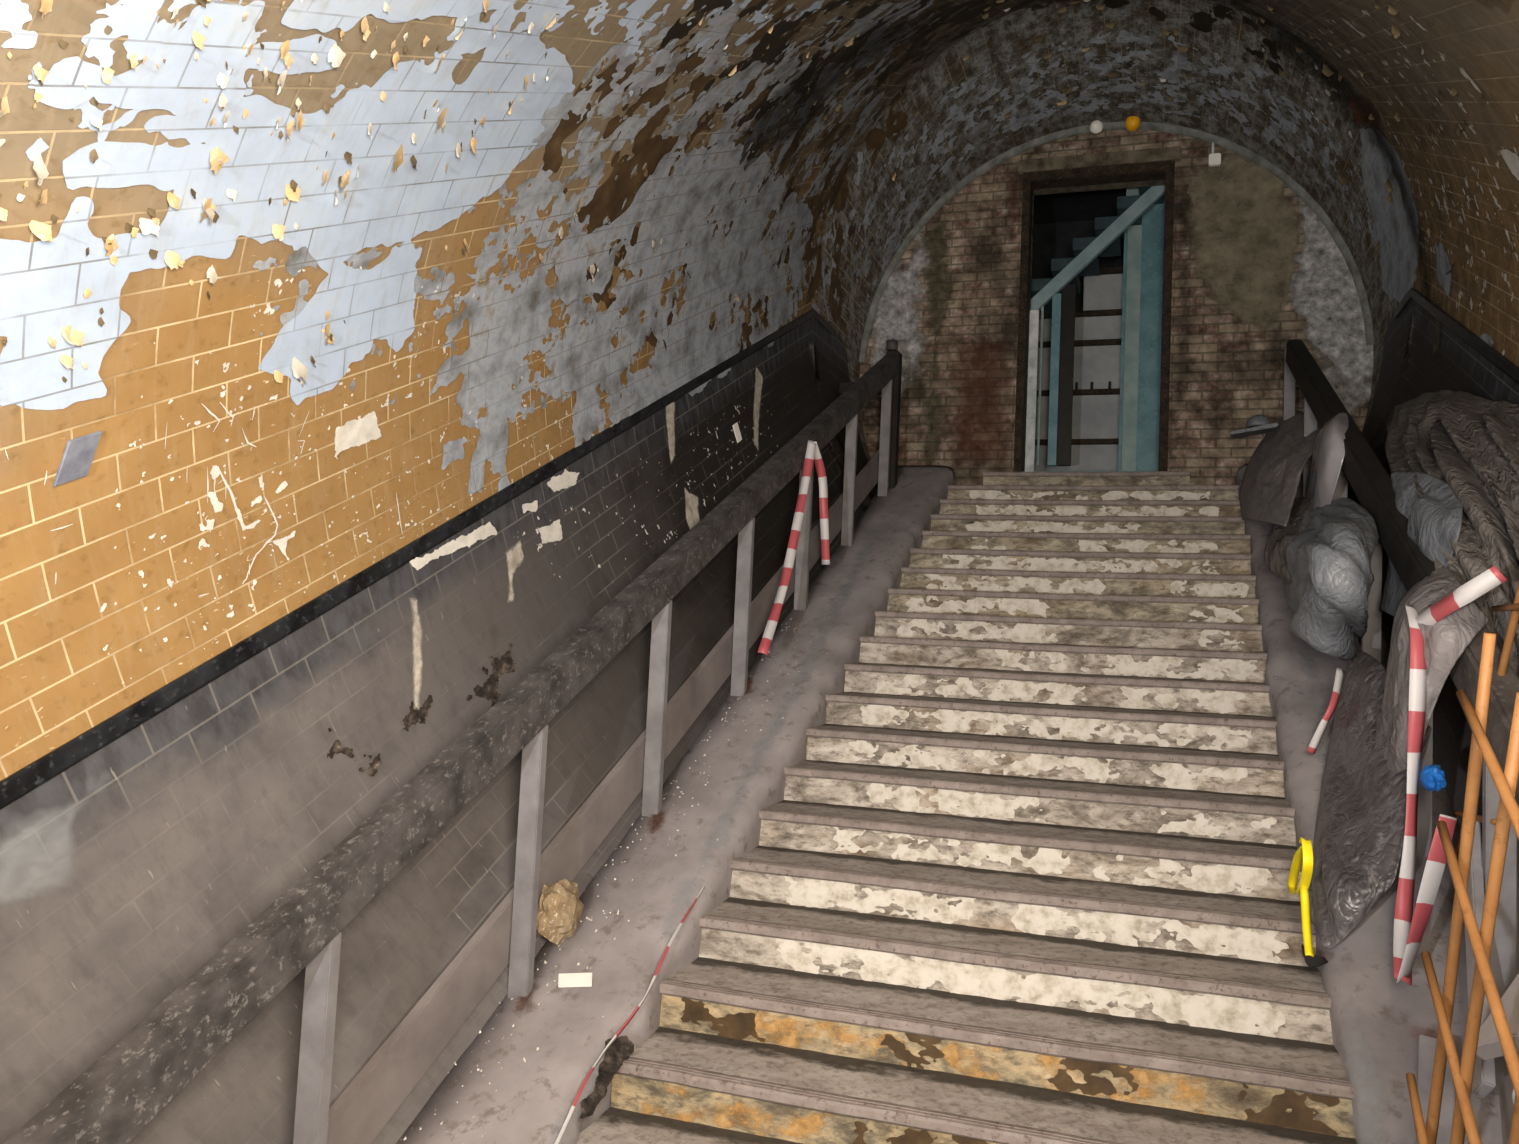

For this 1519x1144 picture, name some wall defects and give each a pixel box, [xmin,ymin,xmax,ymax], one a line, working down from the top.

peeling [0,0,1519,539]
damp [872,223,952,465]
damp [1289,204,1373,414]
crack [165,402,278,597]
peeling [183,435,336,579]
peeling [410,522,497,570]
peeling [518,496,677,577]
damp [411,600,422,708]
corrosion [643,1103,832,1137]
corrosion [755,1011,907,1049]
corrosion [942,1044,998,1080]
corrosion [1099,1065,1206,1114]